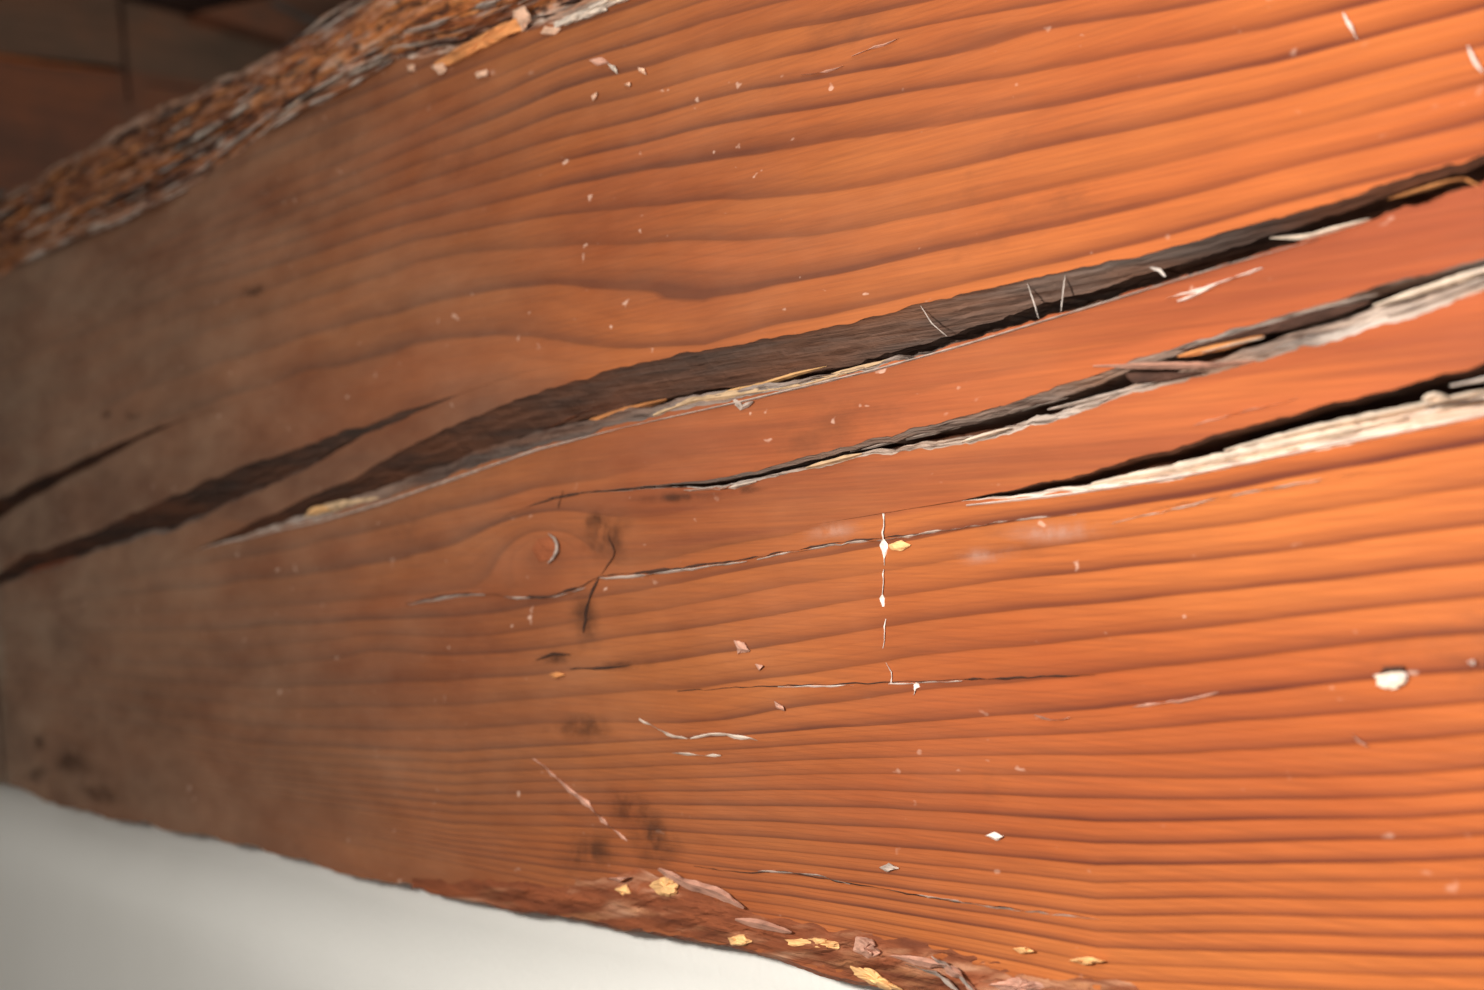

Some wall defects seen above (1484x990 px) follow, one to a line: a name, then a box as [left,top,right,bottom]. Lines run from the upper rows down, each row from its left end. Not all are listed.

crack [0,155,1484,585]
crack [406,364,1484,670]